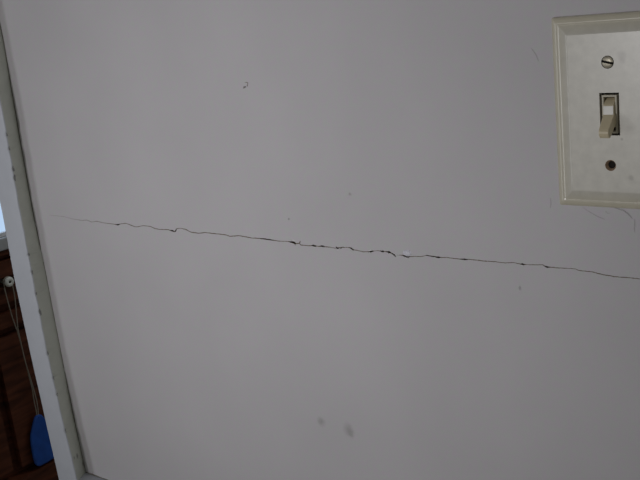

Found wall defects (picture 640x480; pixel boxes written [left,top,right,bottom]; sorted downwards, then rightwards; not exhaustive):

crack [53,215,639,279]